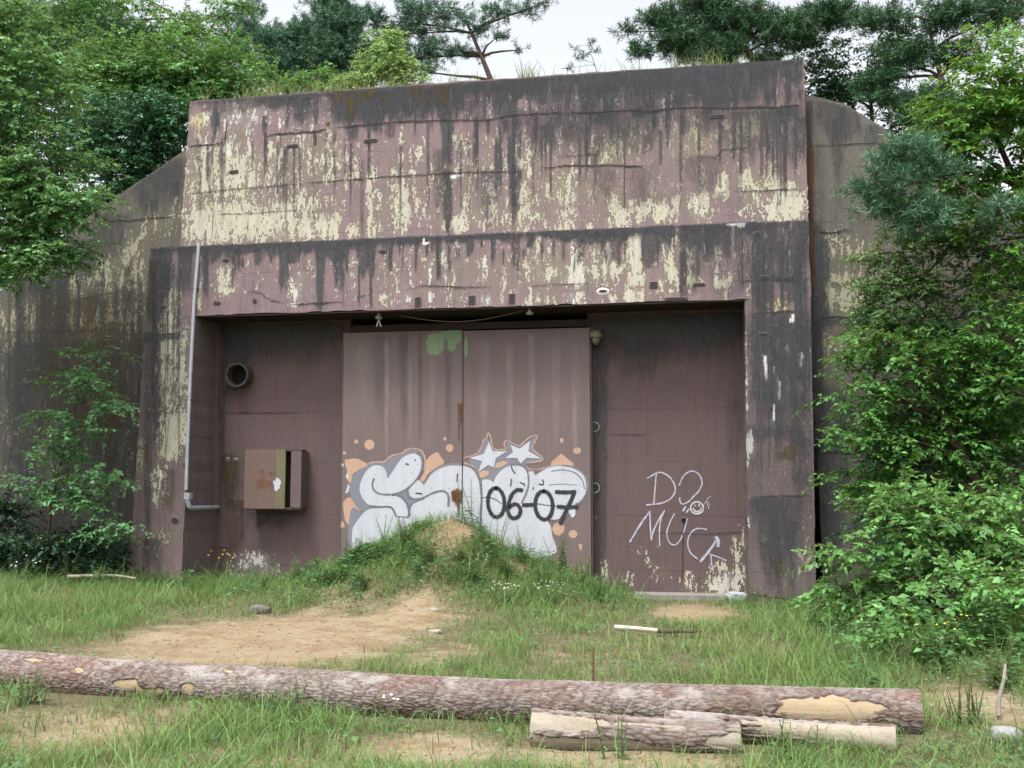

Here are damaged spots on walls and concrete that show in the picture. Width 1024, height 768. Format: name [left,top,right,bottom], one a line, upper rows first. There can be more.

crack [103,103,804,230]
water stain [0,60,880,573]
peeling [0,71,883,520]
peeling [216,550,280,576]
corrosion [451,489,462,512]
peeling [631,518,750,593]